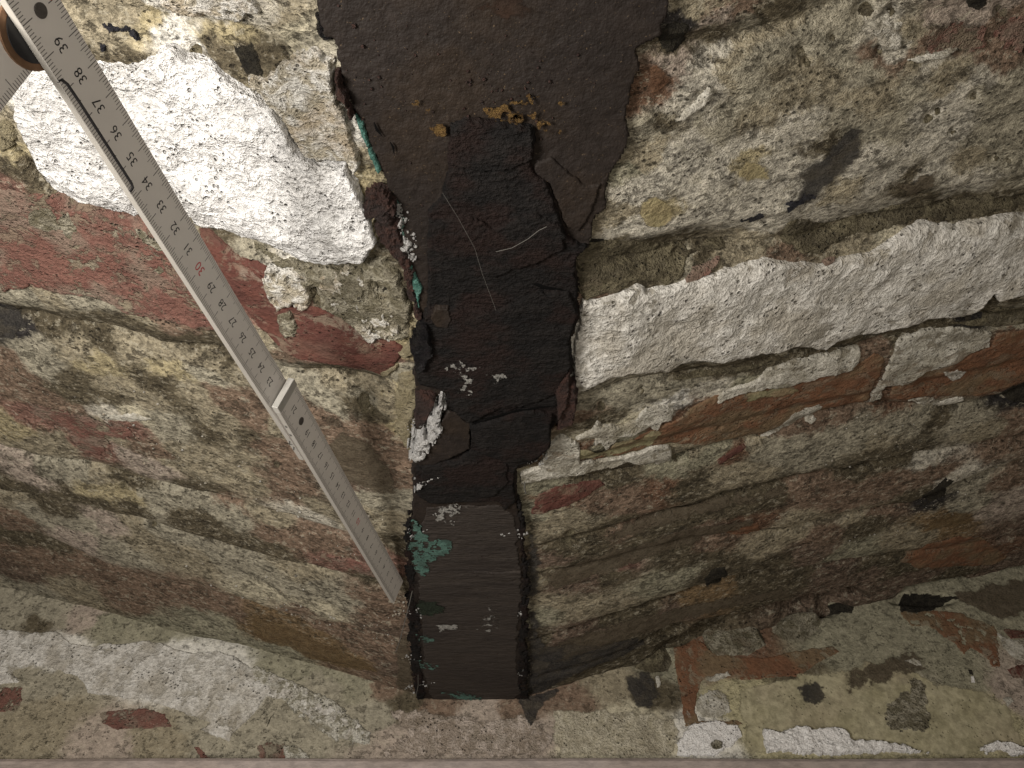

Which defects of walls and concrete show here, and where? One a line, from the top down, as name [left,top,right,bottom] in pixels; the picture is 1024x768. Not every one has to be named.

peeling [431,156,601,278]
spalling [779,193,1024,266]
leakage [407,391,447,462]
leakage [445,361,476,396]
peeling [414,237,725,498]
flaking render [592,353,884,465]
flaking render [889,307,1024,402]
flaking render [531,479,605,514]